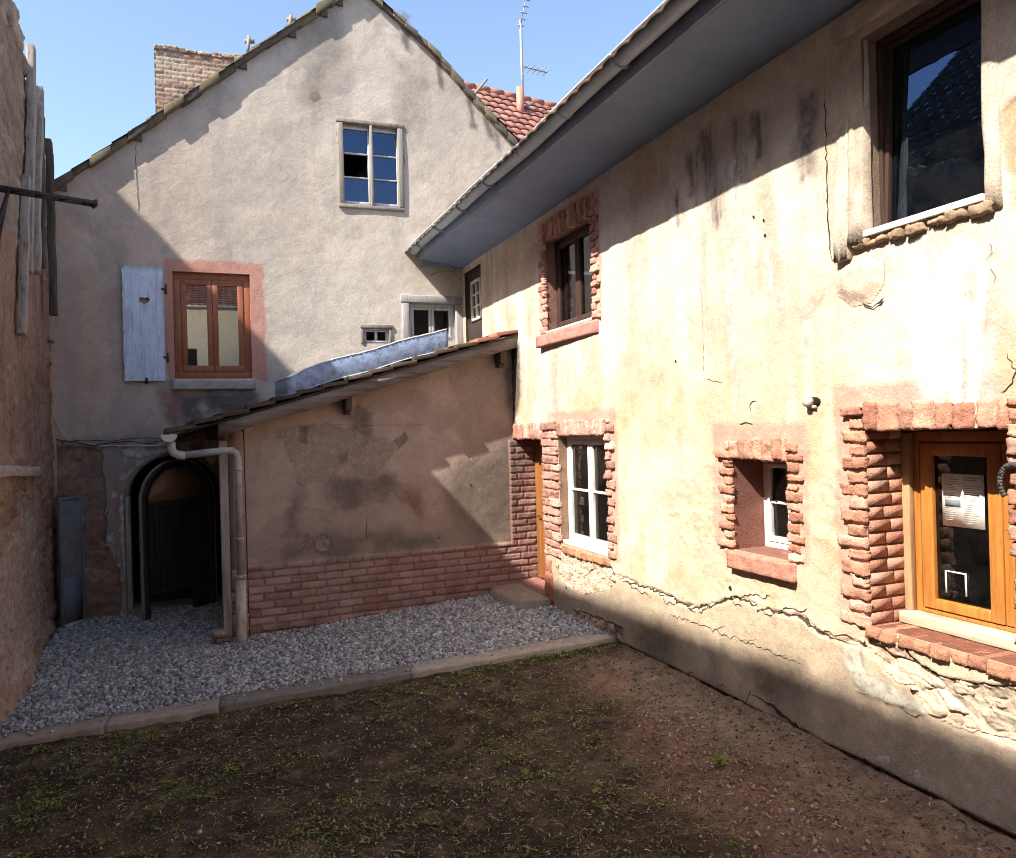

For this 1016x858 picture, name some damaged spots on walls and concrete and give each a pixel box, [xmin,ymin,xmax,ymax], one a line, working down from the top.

water stain [701,132,743,226]
water stain [723,242,745,413]
peeling [893,238,994,428]
spalling [556,549,616,595]
spalling [573,608,624,641]
crack [616,576,857,666]
spalling [859,638,1016,740]